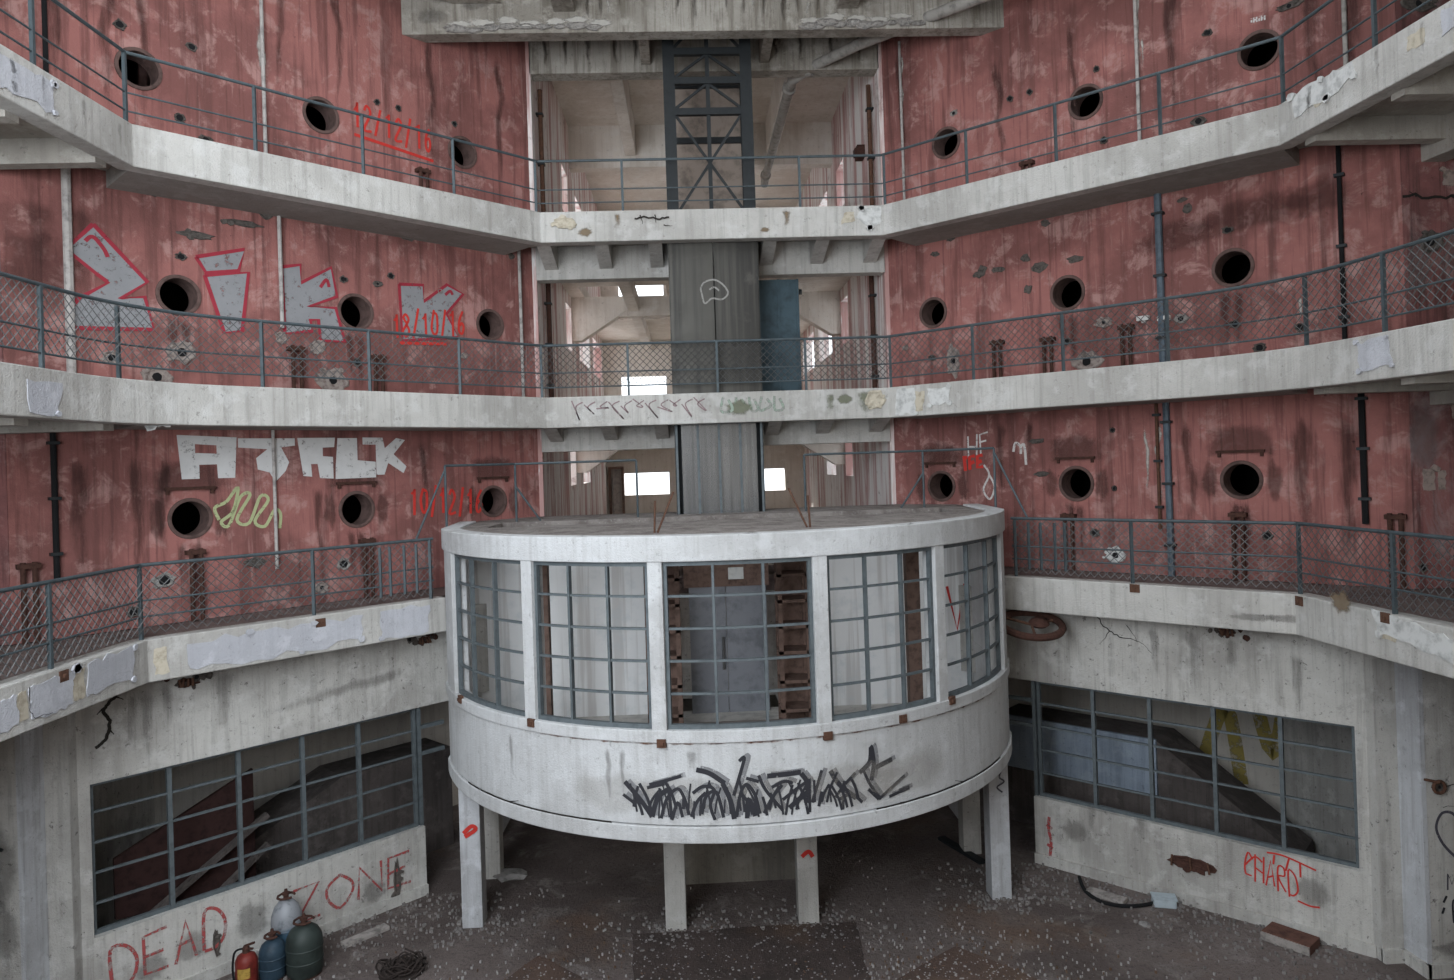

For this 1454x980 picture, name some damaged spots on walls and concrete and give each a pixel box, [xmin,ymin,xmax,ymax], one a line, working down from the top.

water stain [447,0,616,58]
water stain [799,0,912,57]
peeling [27,379,63,417]
peeling [1371,608,1454,665]
crack [95,695,123,749]